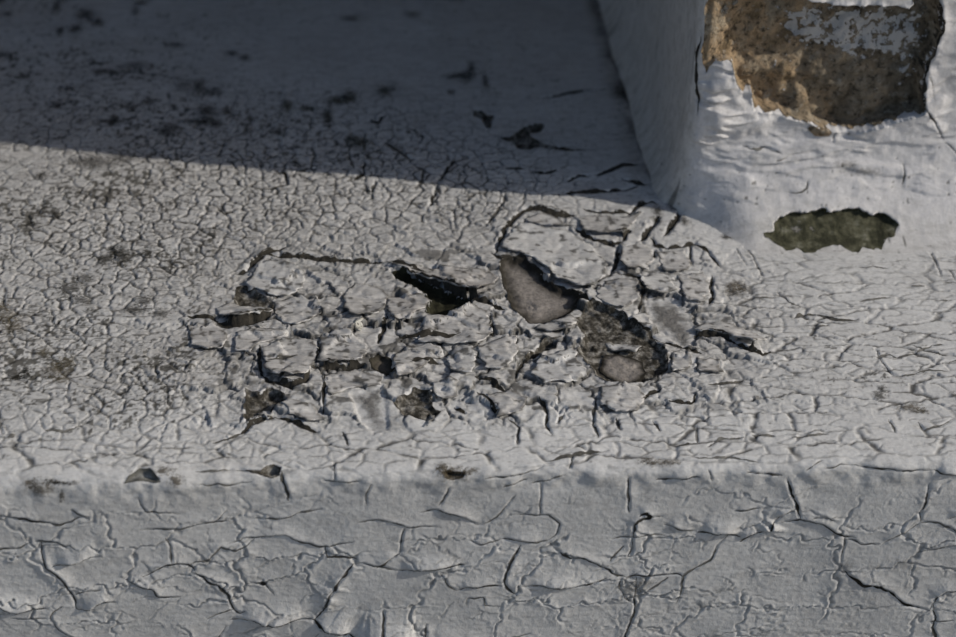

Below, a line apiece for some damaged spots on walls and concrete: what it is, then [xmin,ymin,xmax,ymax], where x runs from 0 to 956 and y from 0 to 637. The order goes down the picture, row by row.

spalling [701,0,942,137]
crack [370,115,456,206]
crack [188,308,365,443]
crack [235,246,505,337]
crack [378,313,461,365]
peeling [187,211,767,426]
crack [454,359,523,445]
crack [488,163,887,356]
spalling [763,208,899,253]
crack [877,344,956,377]
crack [120,380,956,637]
crack [0,510,116,631]